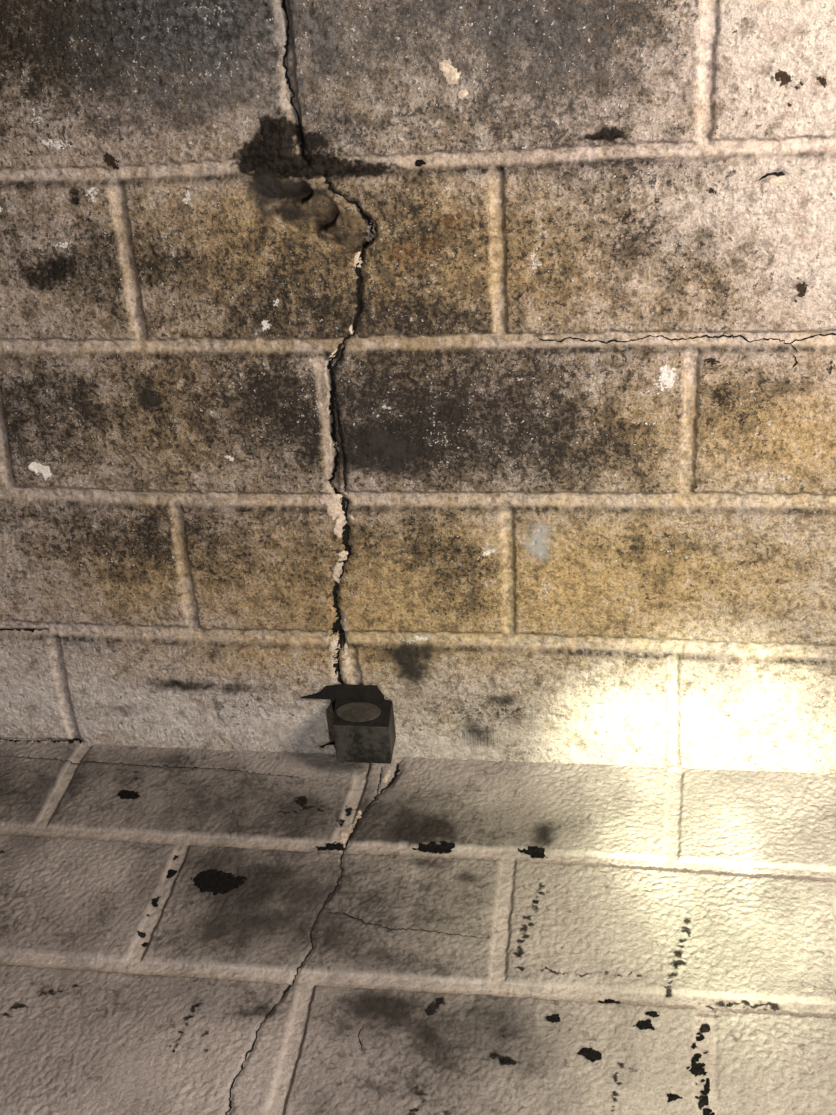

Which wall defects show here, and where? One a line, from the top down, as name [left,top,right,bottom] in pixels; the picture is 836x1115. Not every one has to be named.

water stain [26,101,75,151]
crack [281,0,376,684]
crack [537,333,836,367]
crack [225,763,482,1115]
peeling [686,1024,715,1115]